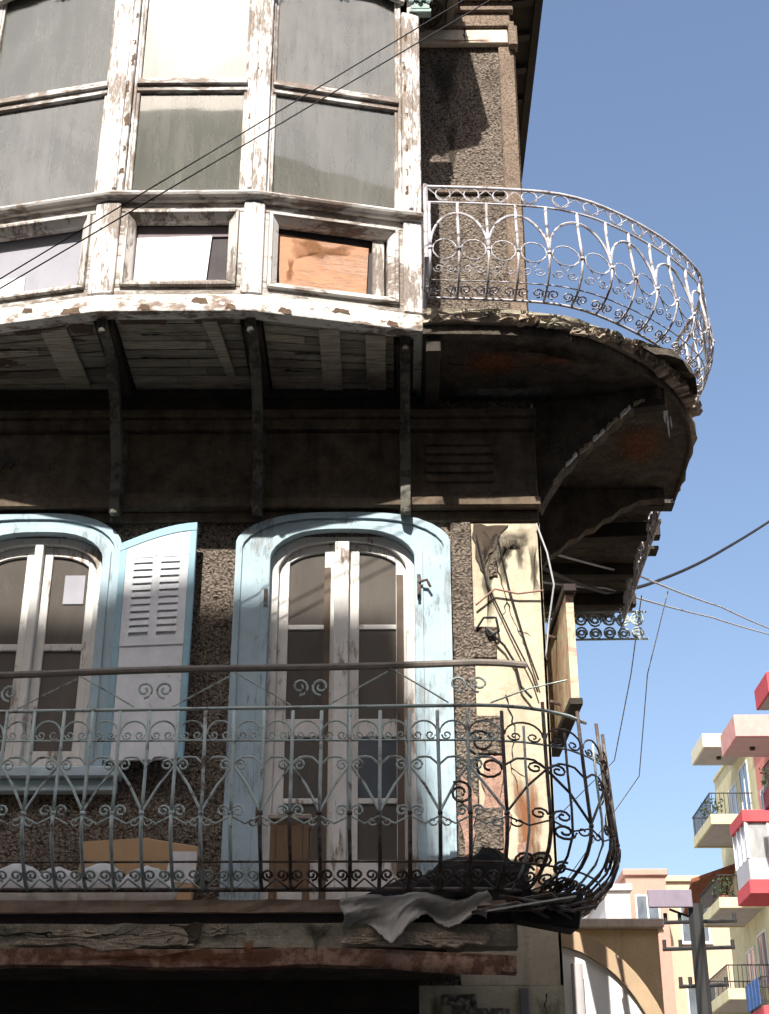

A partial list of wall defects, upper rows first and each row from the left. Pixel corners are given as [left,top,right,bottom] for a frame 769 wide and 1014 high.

peeling [55,307,94,342]
peeling [119,302,167,325]
peeling [185,296,236,324]
spalling [478,311,703,417]
spalling [9,922,228,952]
spalling [340,928,492,948]